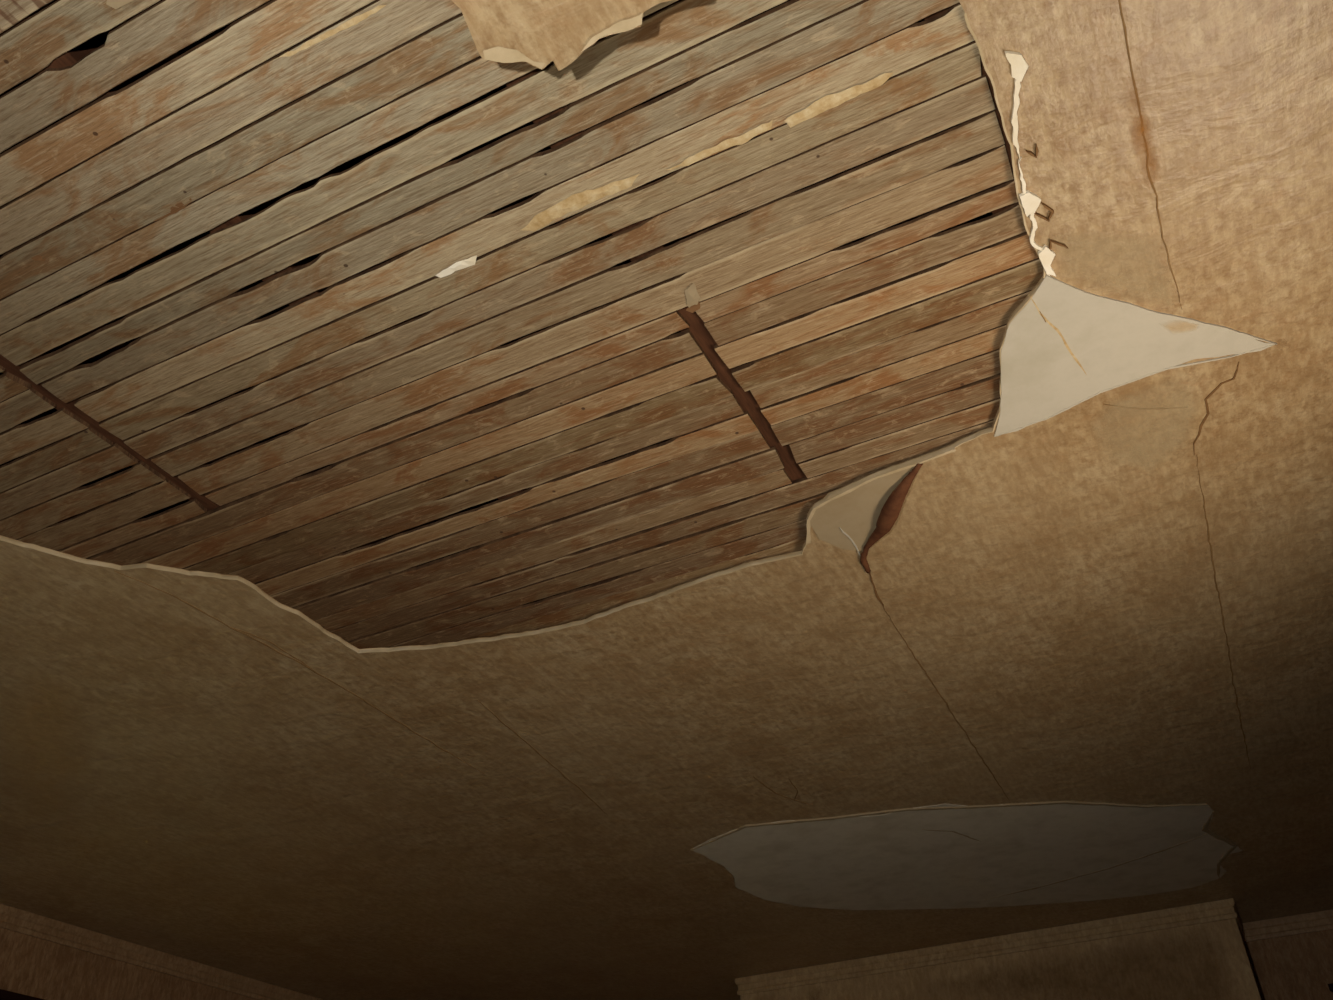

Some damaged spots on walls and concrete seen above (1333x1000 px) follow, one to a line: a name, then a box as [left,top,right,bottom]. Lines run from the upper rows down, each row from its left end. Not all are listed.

spalling [0,0,1277,654]
crack [884,609,1010,801]
peeling [691,801,1243,910]